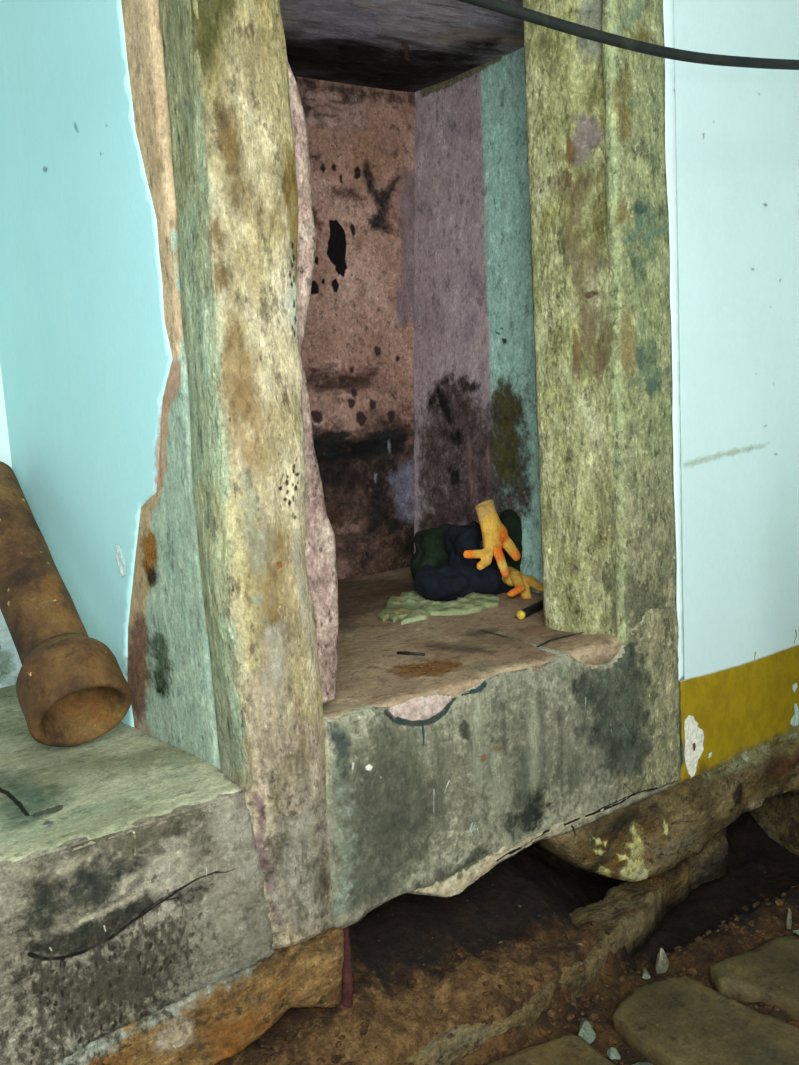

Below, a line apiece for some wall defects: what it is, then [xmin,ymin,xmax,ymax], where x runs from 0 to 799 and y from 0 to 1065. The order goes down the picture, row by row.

water stain [486,378,520,484]
water stain [572,574,665,779]
peeling [684,715,712,778]
peeling [718,683,799,770]
water stain [18,730,442,957]
water stain [593,825,648,882]
crack [28,870,232,961]